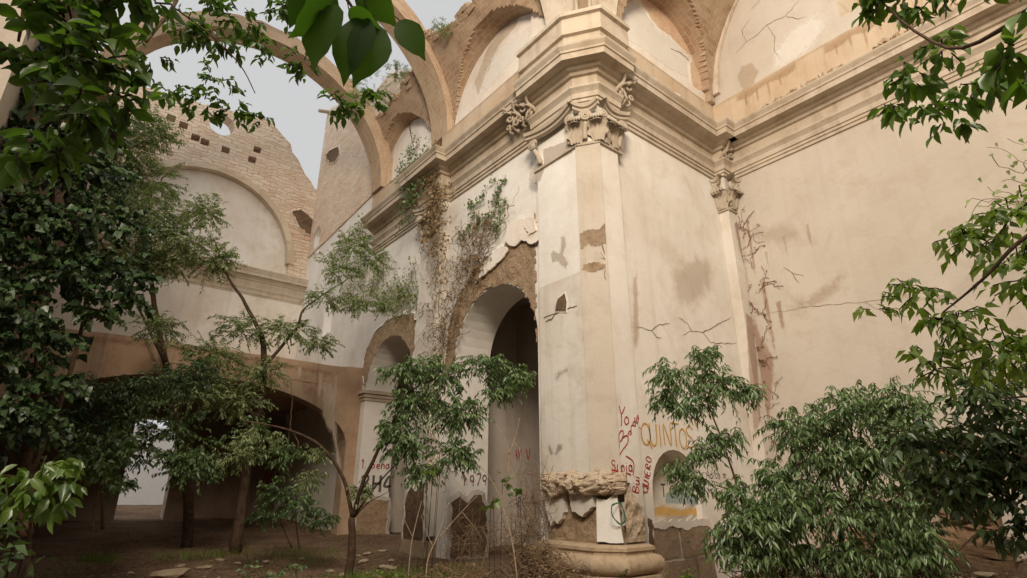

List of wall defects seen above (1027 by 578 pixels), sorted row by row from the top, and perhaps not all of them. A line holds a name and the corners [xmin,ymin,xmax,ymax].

crack [736,1,800,59]
spalling [580,224,606,249]
peeling [551,237,567,267]
spalling [582,262,605,272]
spalling [443,213,539,372]
spalling [554,291,569,314]
crack [772,268,912,317]
crack [636,318,734,344]
spalling [540,468,717,578]